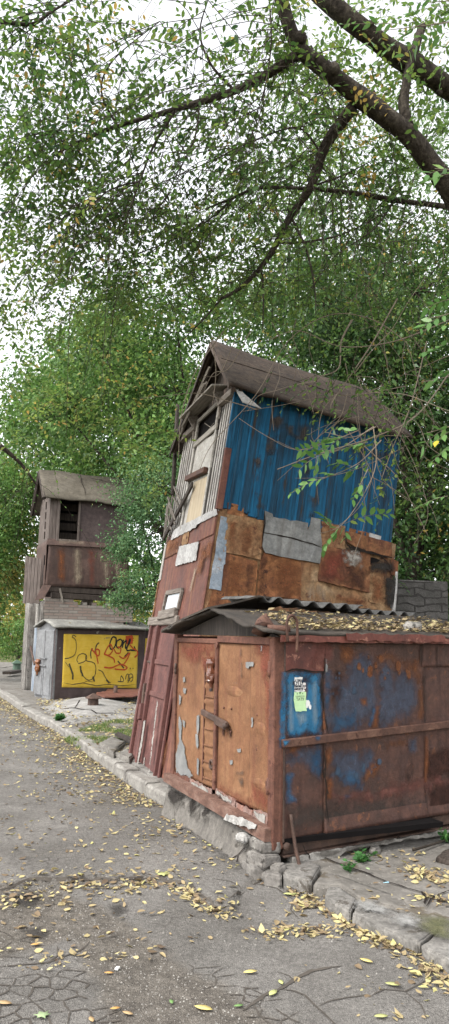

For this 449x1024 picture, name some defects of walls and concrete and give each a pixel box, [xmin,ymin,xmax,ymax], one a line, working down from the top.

peeling [168,677,232,821]
peeling [280,644,443,801]
corrosion [425,739,449,806]
crack [0,930,125,1024]
crack [190,965,440,1024]